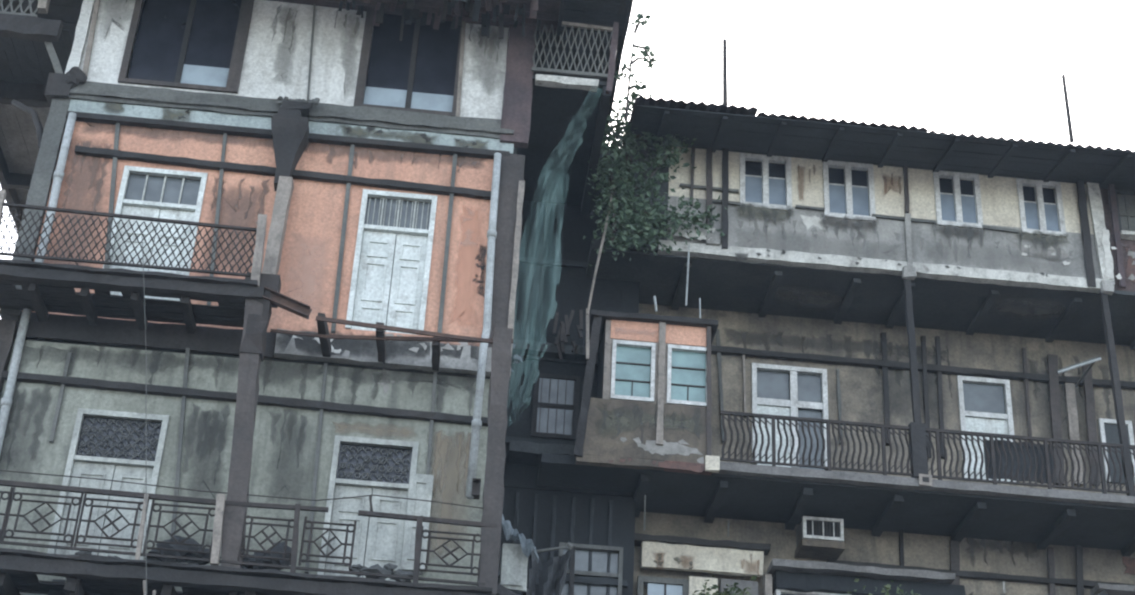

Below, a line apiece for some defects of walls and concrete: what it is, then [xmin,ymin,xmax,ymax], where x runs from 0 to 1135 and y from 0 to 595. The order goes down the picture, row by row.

damp [737,204,792,221]
damp [821,216,876,228]
damp [938,226,982,238]
damp [1017,231,1067,245]
peeling [1102,228,1135,283]
peeling [608,437,704,472]